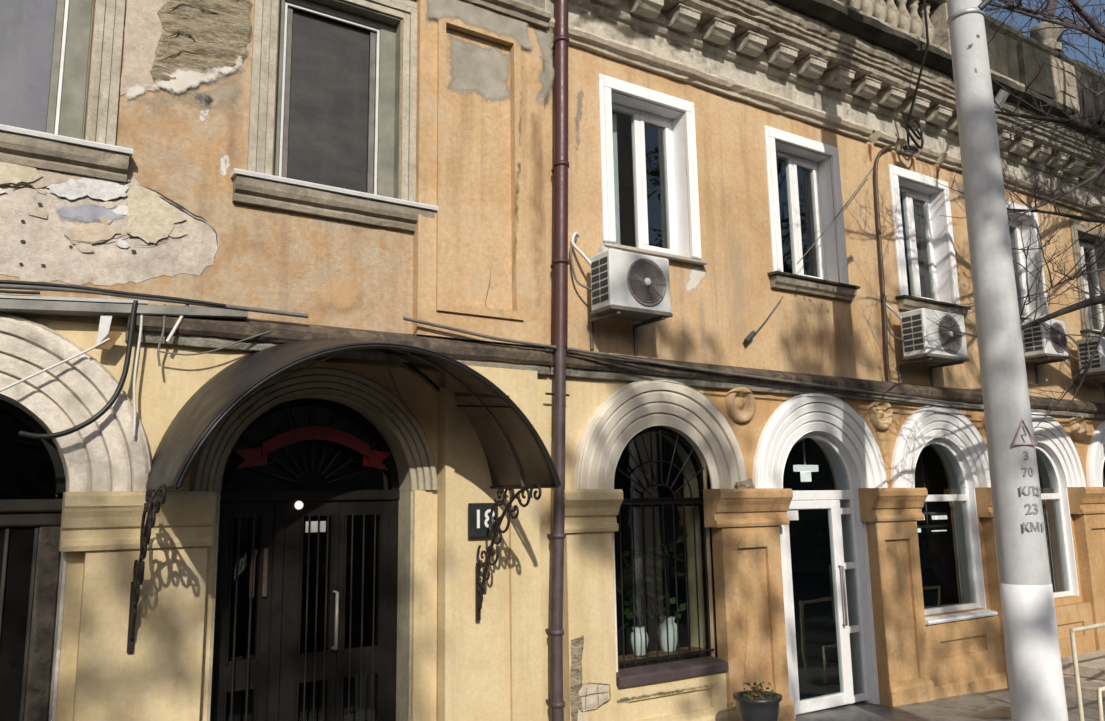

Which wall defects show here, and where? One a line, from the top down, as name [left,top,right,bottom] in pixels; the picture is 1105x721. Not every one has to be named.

spalling [150,0,253,93]
peeling [427,0,554,103]
peeling [0,161,219,286]
spalling [570,635,611,721]